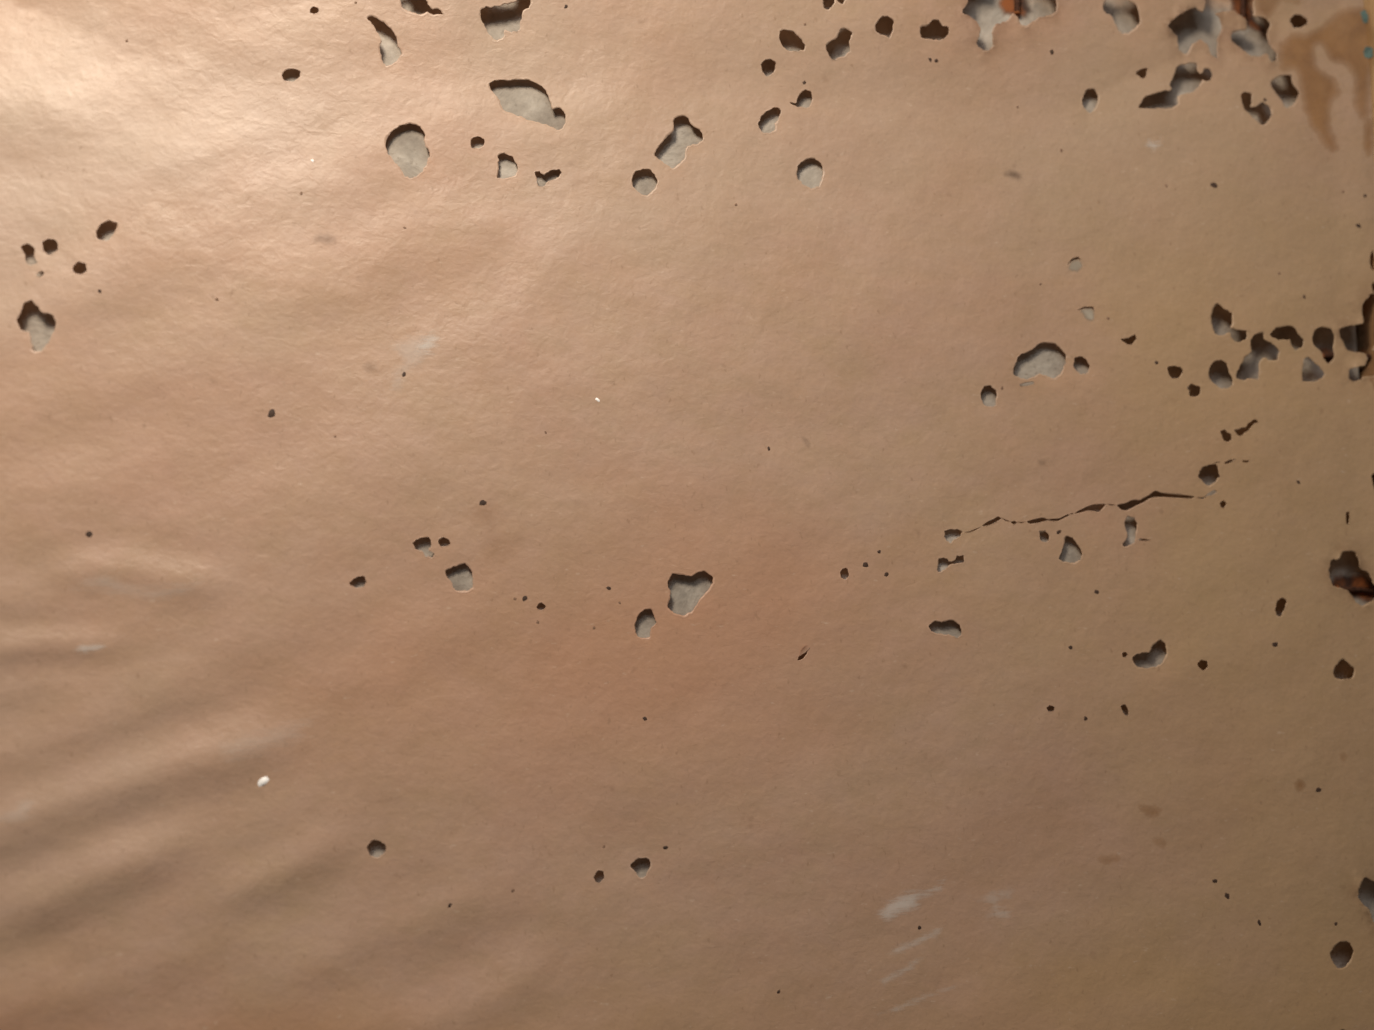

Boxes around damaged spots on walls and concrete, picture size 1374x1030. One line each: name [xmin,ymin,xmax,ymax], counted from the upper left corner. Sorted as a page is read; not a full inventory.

corrosion [1000,0,1029,16]
leakage [1289,15,1369,129]
corrosion [1332,574,1373,602]